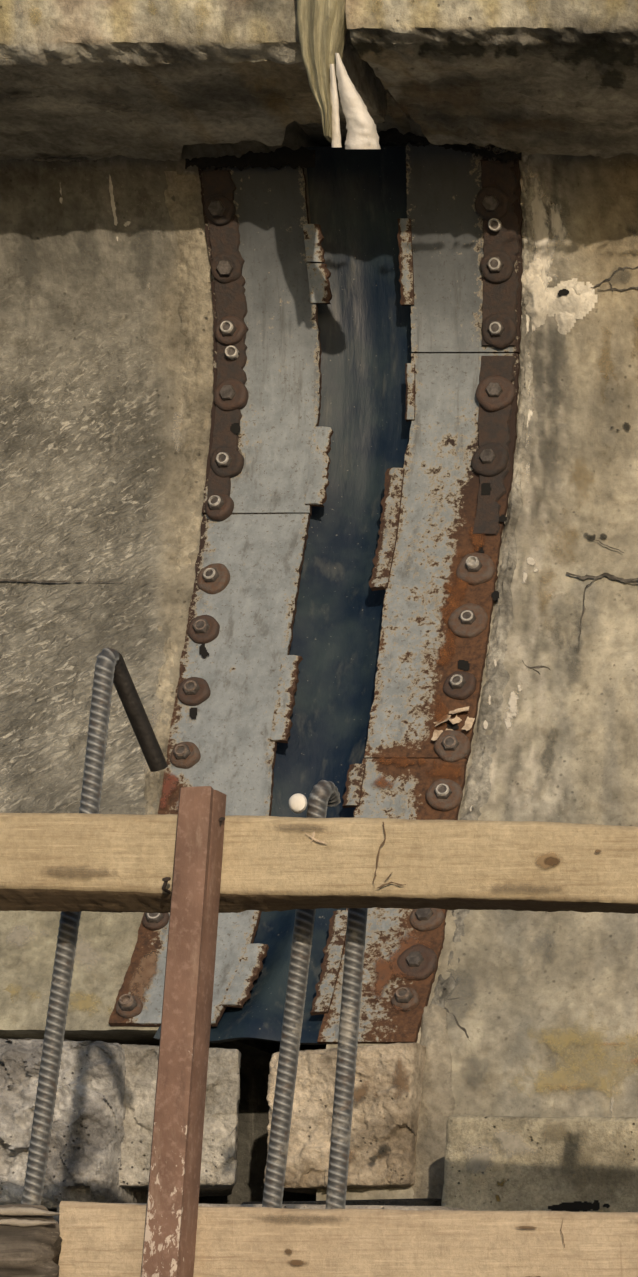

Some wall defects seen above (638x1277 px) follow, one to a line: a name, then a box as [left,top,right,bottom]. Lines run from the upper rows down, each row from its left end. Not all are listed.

spalling [546,278,598,334]
crack [591,266,638,292]
corrosion [436,573,468,664]
crack [566,540,638,648]
corrosion [129,951,157,1002]
corrosion [370,930,430,999]